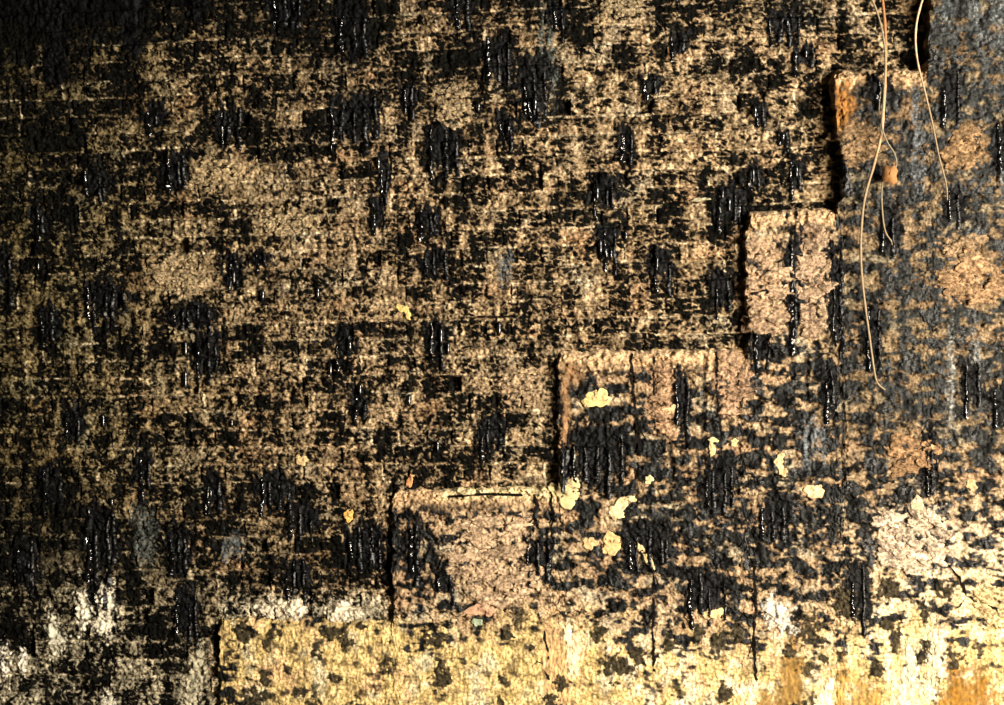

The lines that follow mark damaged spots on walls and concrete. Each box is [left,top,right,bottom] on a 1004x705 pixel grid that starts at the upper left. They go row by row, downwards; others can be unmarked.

leakage [263,0,311,36]
leakage [428,126,460,179]
spalling [740,215,839,342]
flaking render [580,388,612,407]
spalling [642,362,678,442]
spalling [711,349,757,418]
leakage [560,435,625,500]
flaking render [707,437,739,457]
spalling [443,498,546,627]